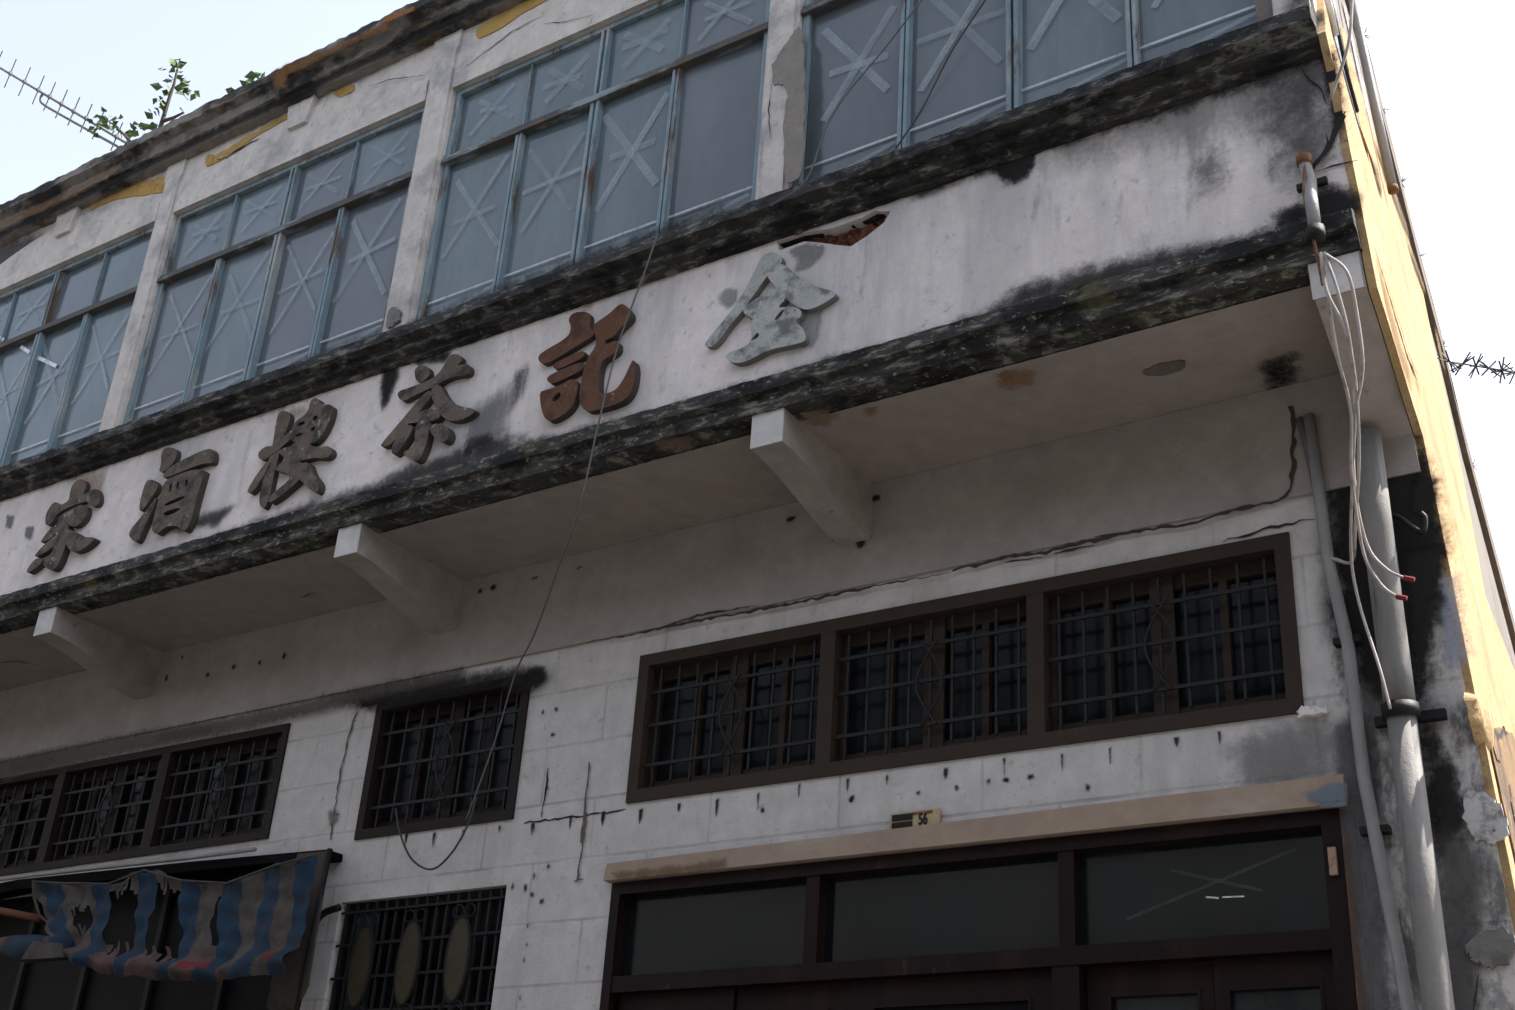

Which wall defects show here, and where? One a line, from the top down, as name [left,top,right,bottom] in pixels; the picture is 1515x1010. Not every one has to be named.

peeling [772,26,806,183]
water stain [1132,52,1344,163]
flaking render [781,214,887,249]
water stain [912,154,1035,198]
water stain [988,140,1425,312]
water stain [1261,352,1297,390]
water stain [1325,487,1383,699]
water stain [350,666,547,711]
water stain [1387,430,1490,1010]
crack [524,762,626,883]
flaking render [1462,726,1515,864]